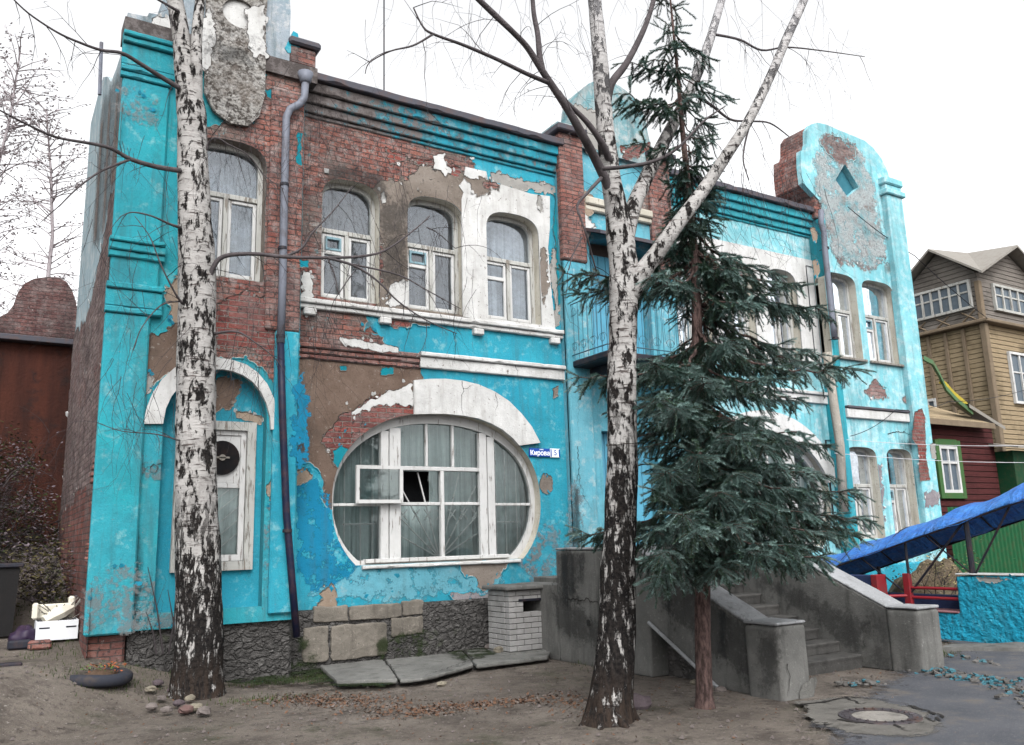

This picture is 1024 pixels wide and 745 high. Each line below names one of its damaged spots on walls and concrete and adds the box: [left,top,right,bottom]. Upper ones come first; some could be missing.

peeling [202,8,217,74]
peeling [244,4,270,59]
spalling [207,73,301,382]
peeling [810,133,889,273]
spalling [146,274,178,394]
spalling [216,374,264,425]
spalling [289,117,561,607]
spalling [864,379,889,400]
spalling [902,395,940,508]